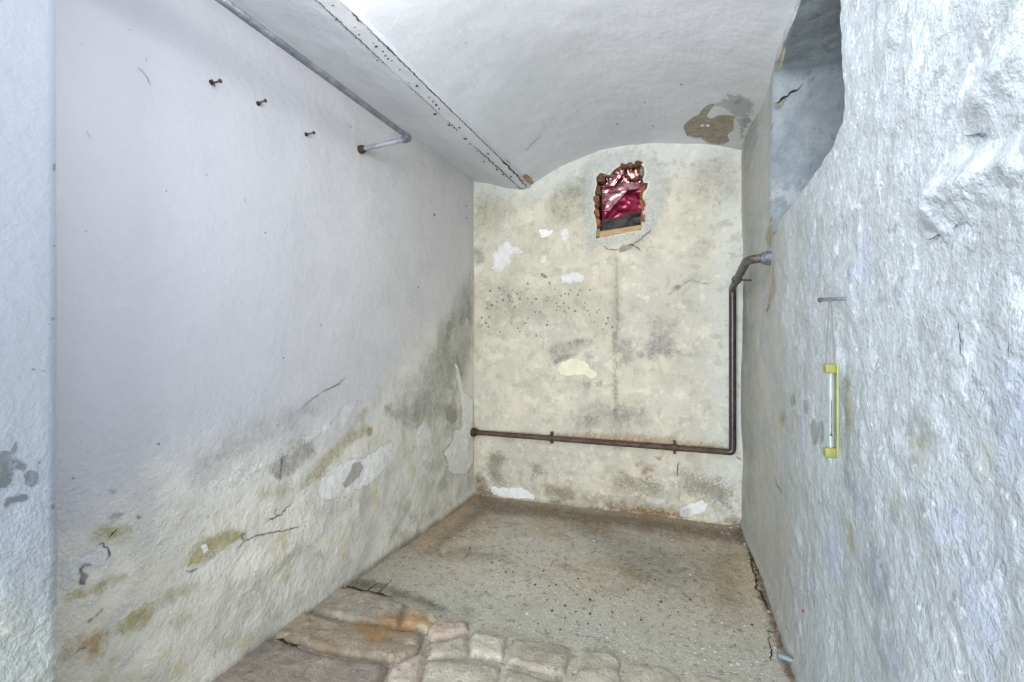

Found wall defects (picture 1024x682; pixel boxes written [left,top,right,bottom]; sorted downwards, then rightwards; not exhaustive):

crack [774,84,803,109]
spalling [683,104,735,145]
spalling [593,160,651,252]
peeling [557,352,624,379]
peeling [443,351,473,475]
peeling [0,441,41,506]
water stain [188,532,241,573]
crack [235,503,300,557]
peeling [317,441,393,501]
peeling [491,486,535,500]
peeling [679,500,707,517]
crack [748,547,773,659]